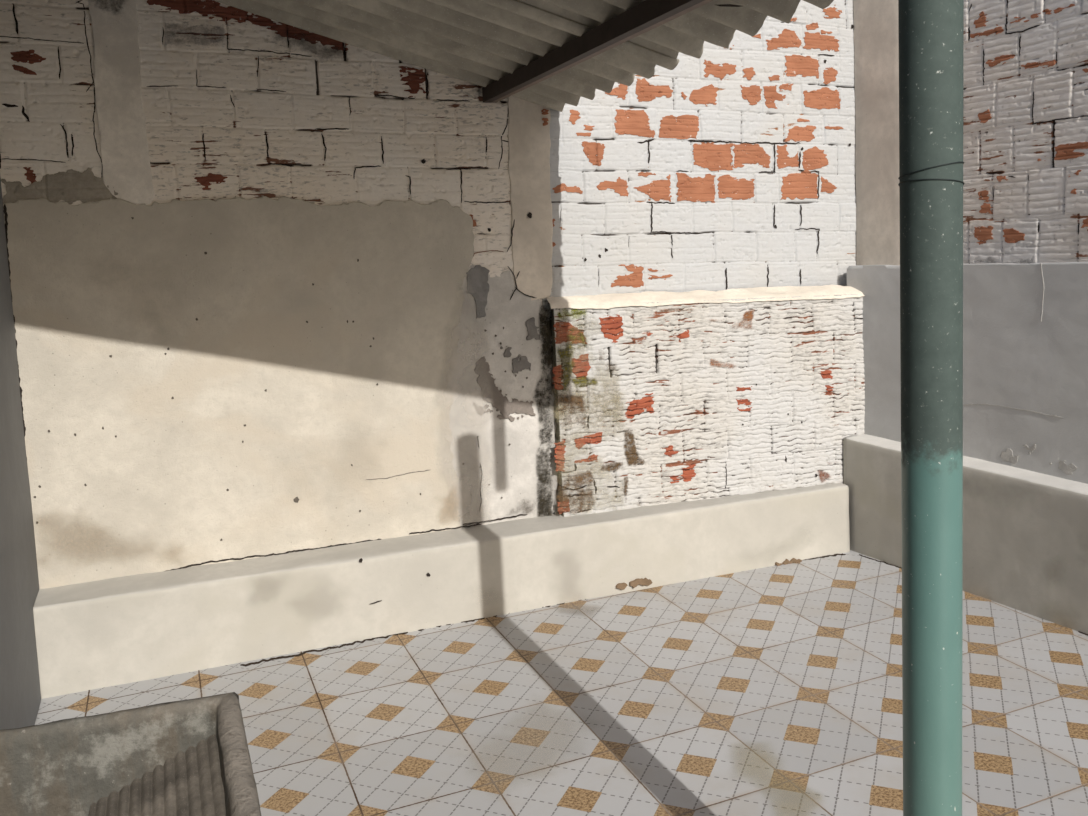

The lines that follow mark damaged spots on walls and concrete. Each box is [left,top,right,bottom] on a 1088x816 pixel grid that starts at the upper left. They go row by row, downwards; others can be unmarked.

peeling [970,4,1075,42]
peeling [596,5,844,203]
peeling [569,109,605,166]
crack [464,110,535,300]
peeling [974,190,1025,245]
peeling [611,264,673,288]
spalling [466,265,536,421]
peeling [599,315,624,343]
water stain [524,301,628,516]
peeling [625,393,655,419]
peeling [553,432,603,472]
peeling [669,464,696,484]